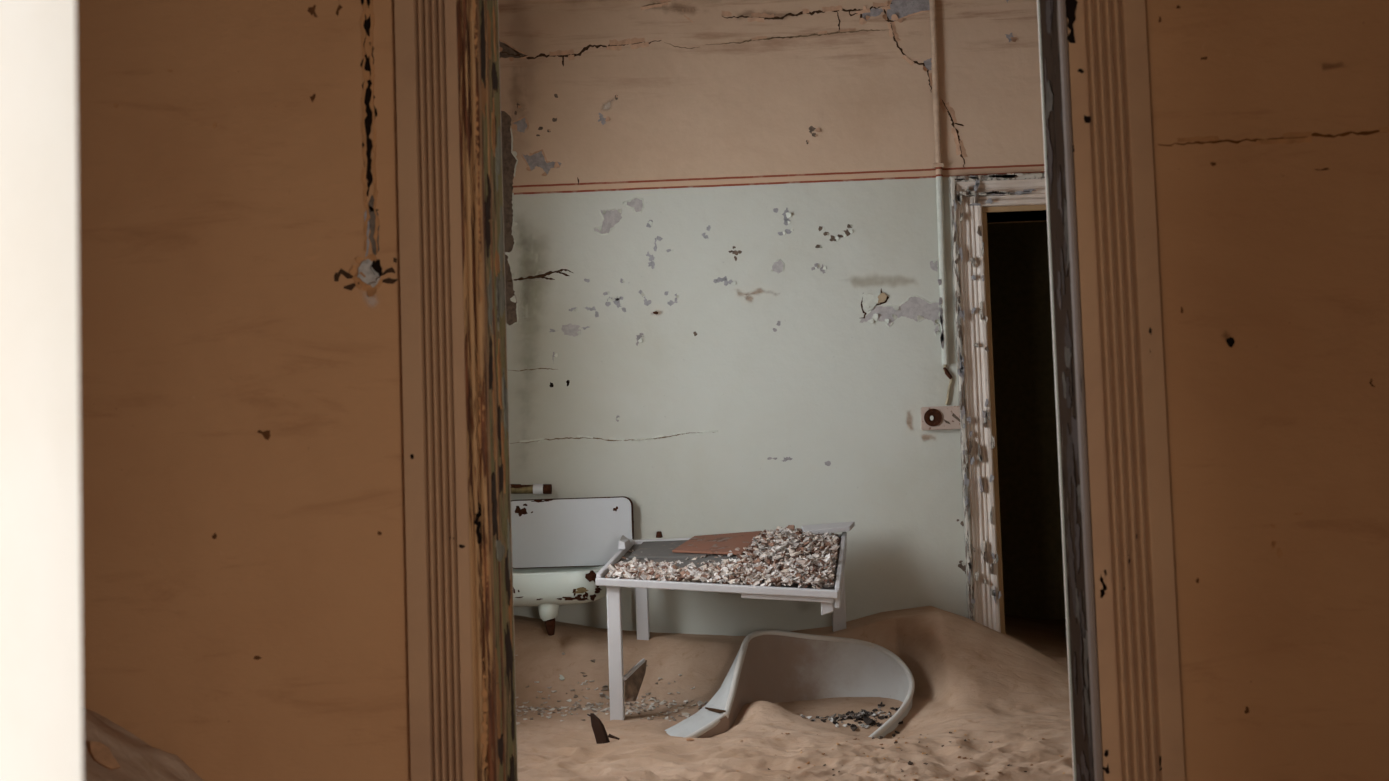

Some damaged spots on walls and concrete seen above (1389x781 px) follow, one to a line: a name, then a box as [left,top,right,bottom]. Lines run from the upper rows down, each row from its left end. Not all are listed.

spalling [859,0,930,25]
crack [501,0,968,167]
crack [360,0,380,256]
crack [1158,127,1389,146]
crack [509,269,573,282]
peeling [549,279,679,337]
peeling [593,197,673,269]
peeling [713,276,736,286]
peeling [773,207,793,236]
peeling [811,224,853,274]
peeling [450,0,562,781]
peeling [859,58,1110,781]